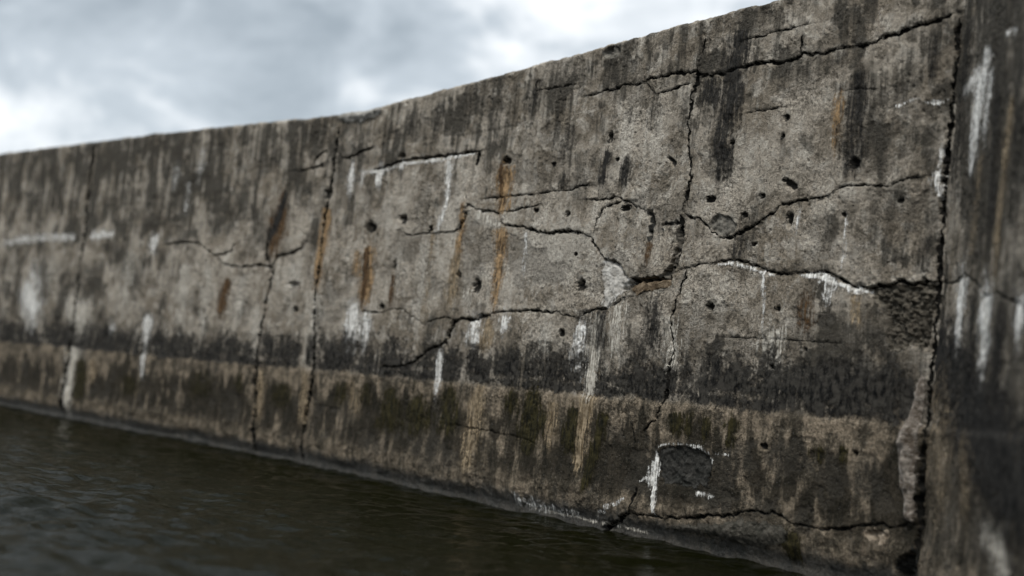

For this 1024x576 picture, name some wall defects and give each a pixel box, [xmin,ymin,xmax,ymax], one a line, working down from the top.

rust [493,161,516,214]
leakage [932,22,1023,257]
rust [313,208,333,291]
crack [168,128,481,463]
rust [352,241,376,309]
rust [444,202,466,308]
leakage [0,149,917,513]
rust [477,227,509,350]
crack [362,11,1023,567]
spalling [865,280,939,352]
efflorescence [514,492,647,534]
spalling [659,444,712,489]